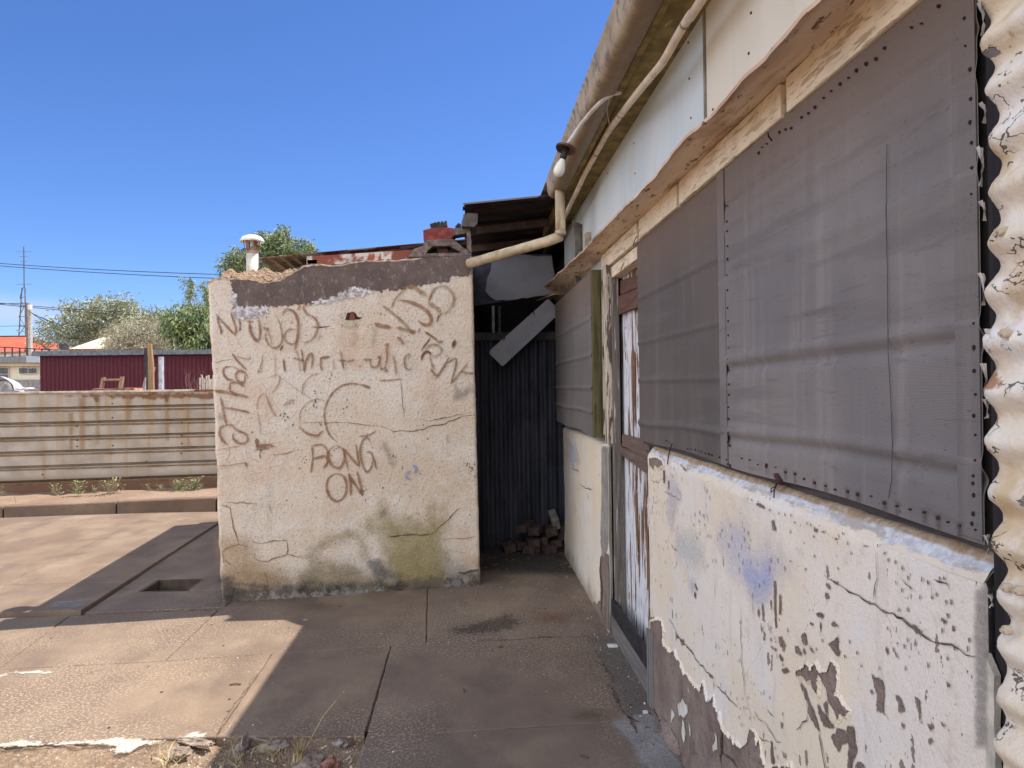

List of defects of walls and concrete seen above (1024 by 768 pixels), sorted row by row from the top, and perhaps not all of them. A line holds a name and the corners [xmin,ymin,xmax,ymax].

peeling [208,254,473,336]
crack [302,386,470,437]
crack [221,502,305,590]
crack [389,508,480,574]
spalling [593,446,609,630]
peeling [693,511,864,768]
peeling [747,498,851,555]
crack [824,552,974,657]
peeling [863,544,954,634]
peeling [649,617,795,768]